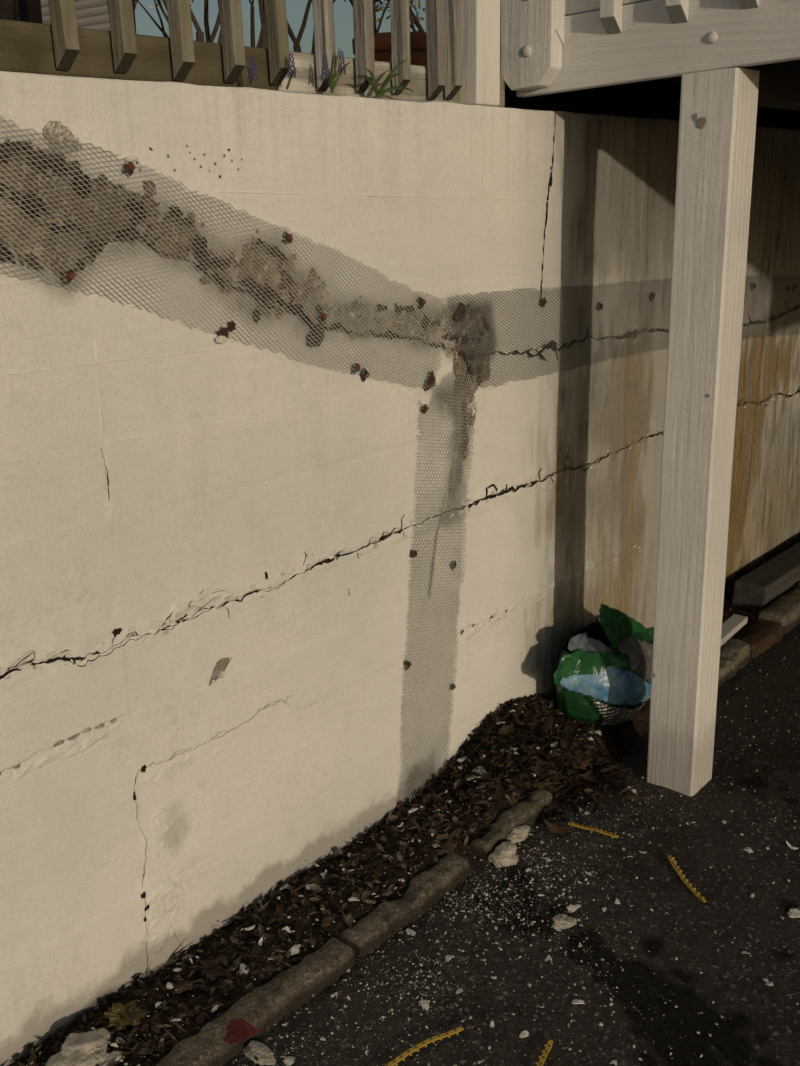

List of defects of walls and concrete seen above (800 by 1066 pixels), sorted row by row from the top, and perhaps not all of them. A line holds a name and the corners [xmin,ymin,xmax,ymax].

spalling [0,121,490,460]
crack [0,428,663,680]
crack [0,184,669,385]
damp [354,308,496,595]
crack [540,115,556,299]
rust [724,326,798,598]
crack [738,386,800,408]
crack [742,303,800,326]
crack [133,695,316,976]